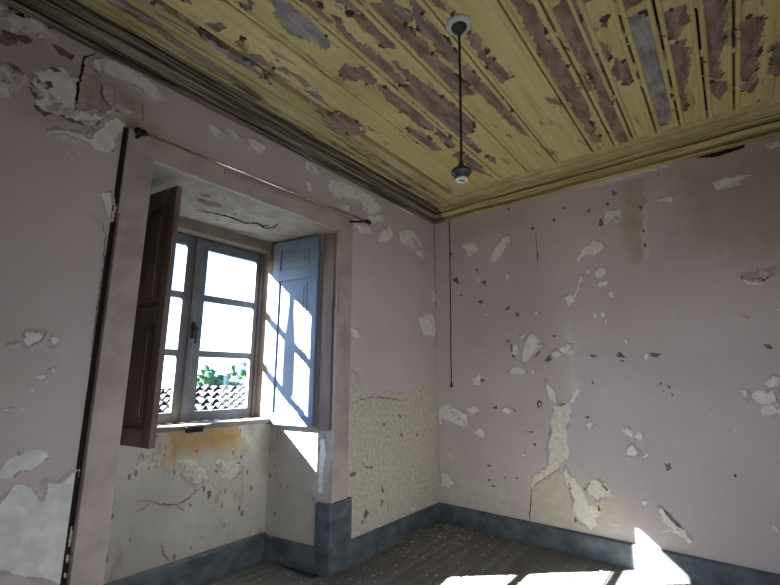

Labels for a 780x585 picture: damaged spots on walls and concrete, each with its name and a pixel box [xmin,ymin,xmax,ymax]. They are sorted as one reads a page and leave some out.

peeling [0,6,169,157]
crack [74,52,121,113]
peeling [177,0,279,85]
peeling [267,0,532,174]
peeling [510,0,780,145]
crack [197,209,279,235]
peeling [0,450,80,585]
crack [136,485,205,512]
peeling [347,367,486,539]
peeling [505,334,612,530]
peeling [641,498,694,544]
peeling [740,372,780,419]